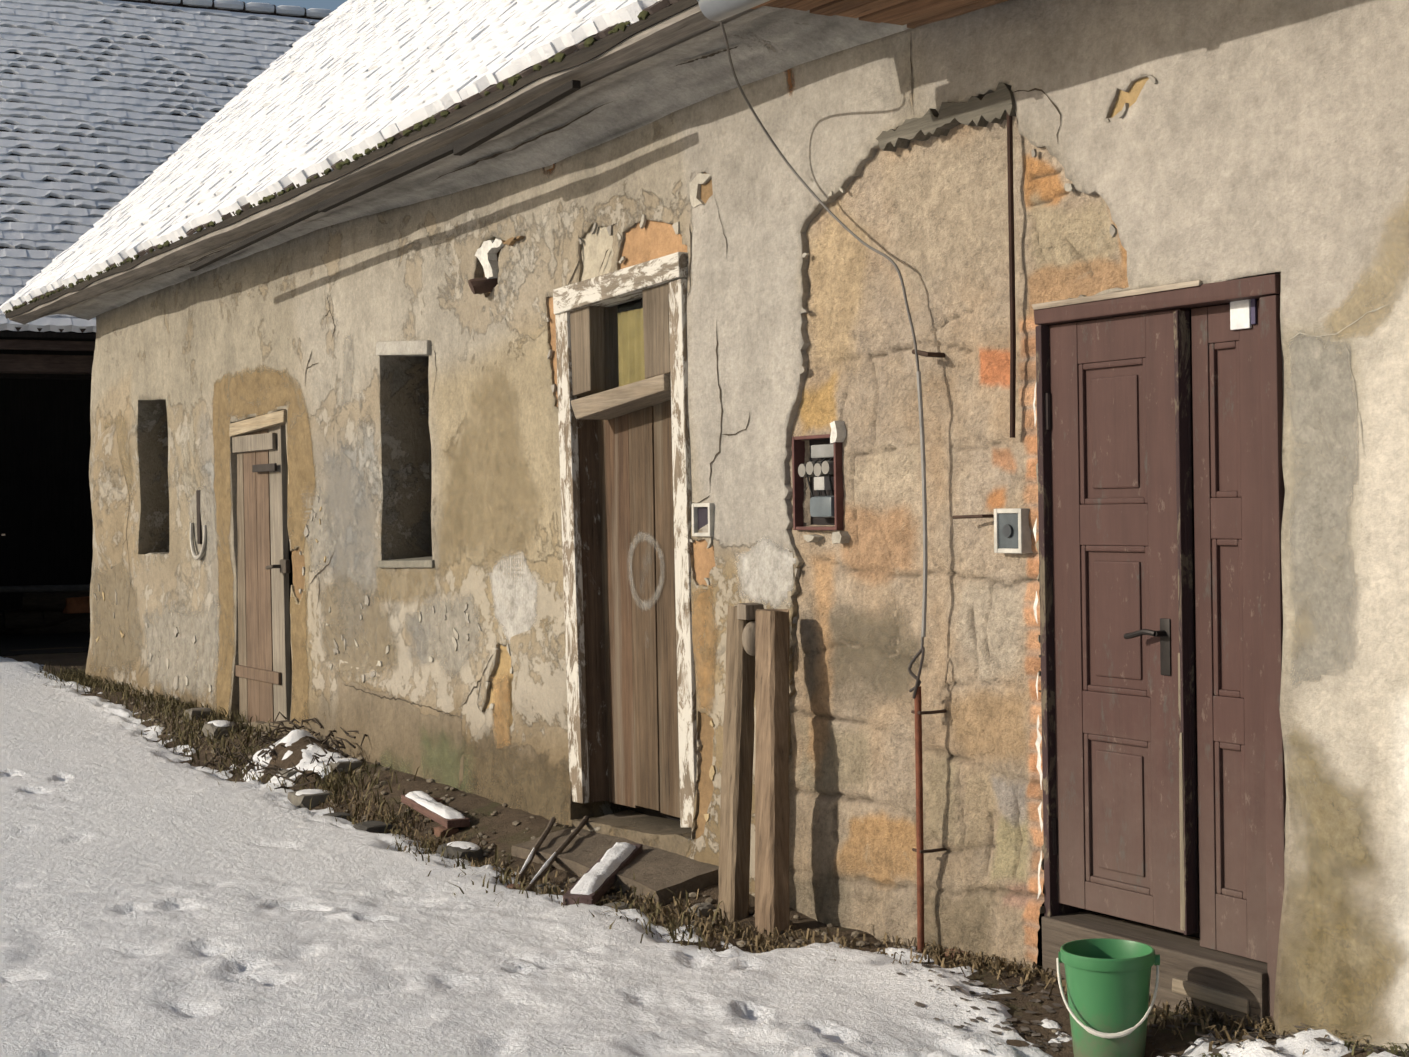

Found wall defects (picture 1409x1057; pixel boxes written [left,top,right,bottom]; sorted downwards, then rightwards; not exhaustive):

crack [1012,88,1061,142]
spalling [1104,75,1158,122]
spalling [689,172,713,208]
spalling [579,214,687,281]
crack [687,200,727,297]
crack [693,320,750,503]
spalling [789,82,1129,972]